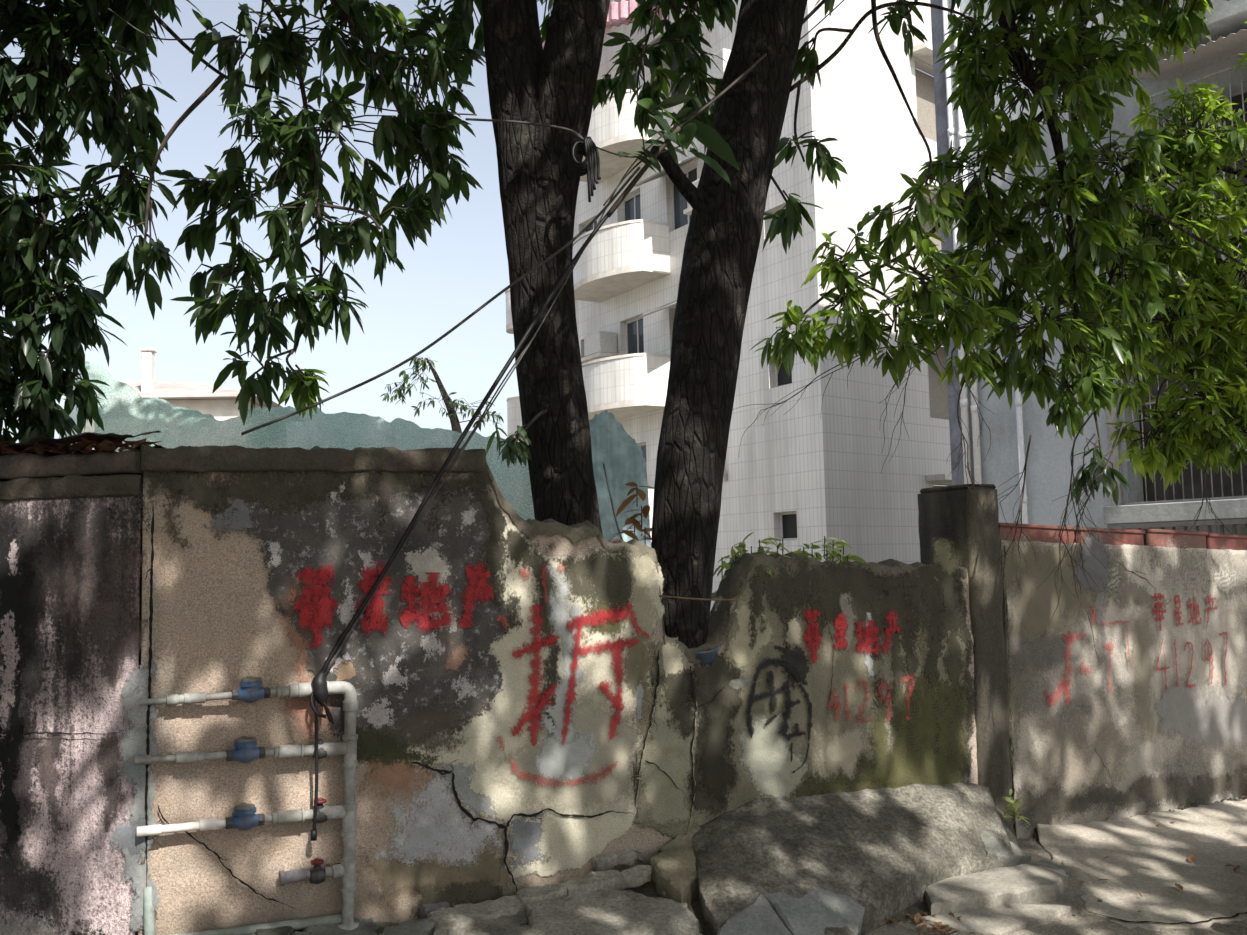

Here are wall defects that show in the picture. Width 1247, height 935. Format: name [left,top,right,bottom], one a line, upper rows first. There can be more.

crack [0,506,298,910]
spalling [325,652,356,681]
damp [0,463,743,935]
crack [411,650,725,892]
damp [748,557,977,783]
damp [792,768,937,797]